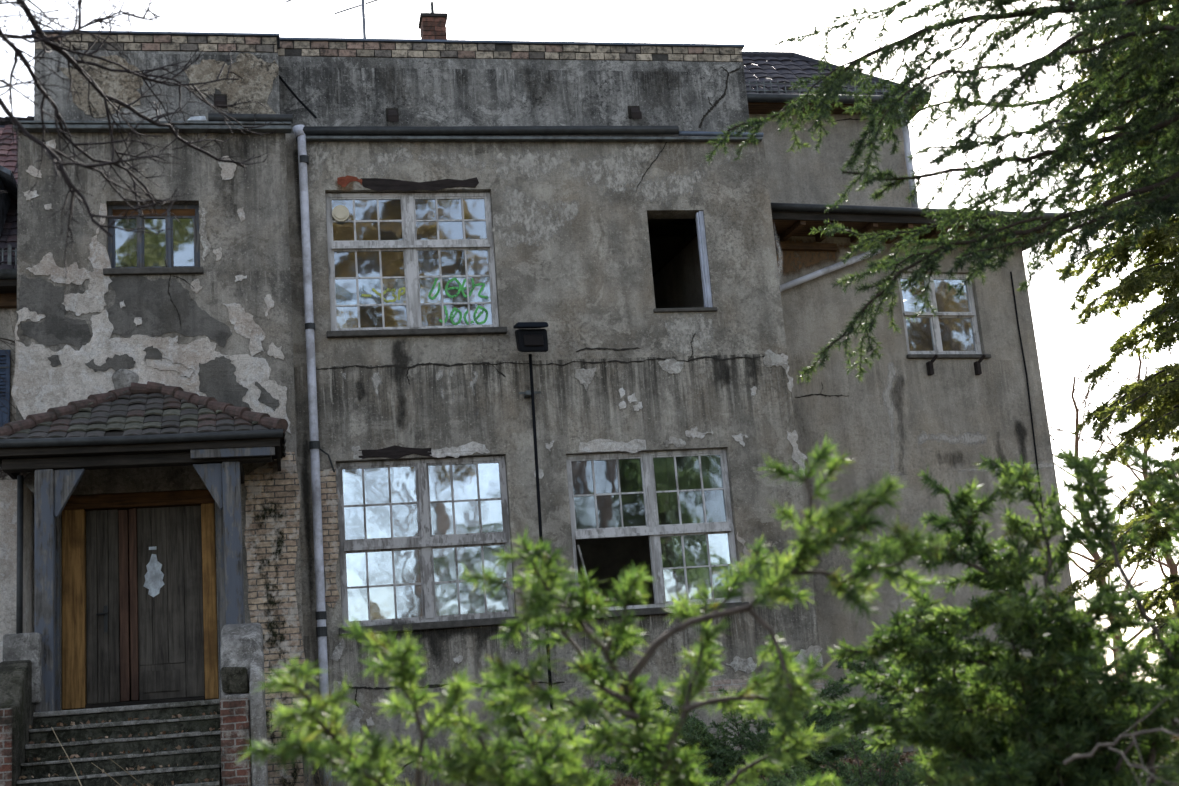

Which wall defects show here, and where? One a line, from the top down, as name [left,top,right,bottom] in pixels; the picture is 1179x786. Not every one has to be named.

flaking render [56,54,143,118]
flaking render [185,53,279,114]
crack [699,67,741,128]
peeling [218,156,237,180]
rust [336,175,362,191]
peeling [11,203,291,434]
leakage [357,373,380,400]
leakage [380,340,409,427]
crack [316,334,788,391]
leakage [748,356,758,386]
crack [795,382,844,398]
peeling [787,430,807,476]